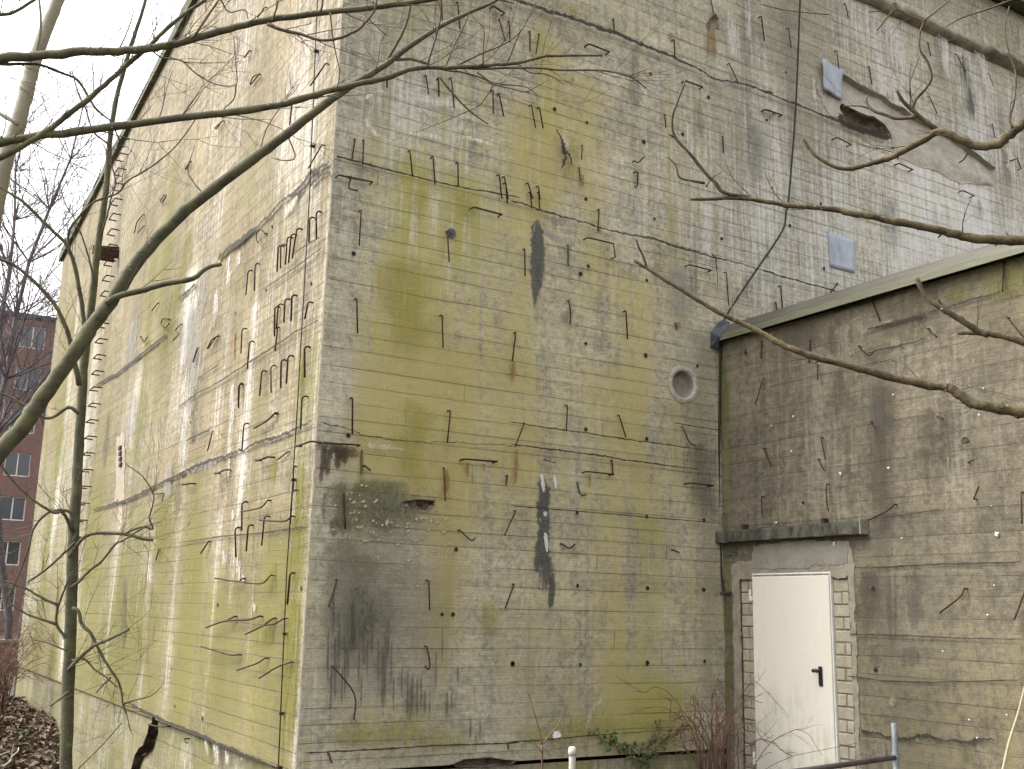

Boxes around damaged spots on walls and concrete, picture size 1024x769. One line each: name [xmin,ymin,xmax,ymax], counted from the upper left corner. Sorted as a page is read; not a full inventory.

crack [499,0,892,140]
crack [556,129,573,168]
spalling [838,104,891,137]
leakage [530,219,545,305]
peeling [331,484,453,561]
leakage [534,474,557,607]
leakage [327,553,459,718]
crack [128,703,273,767]